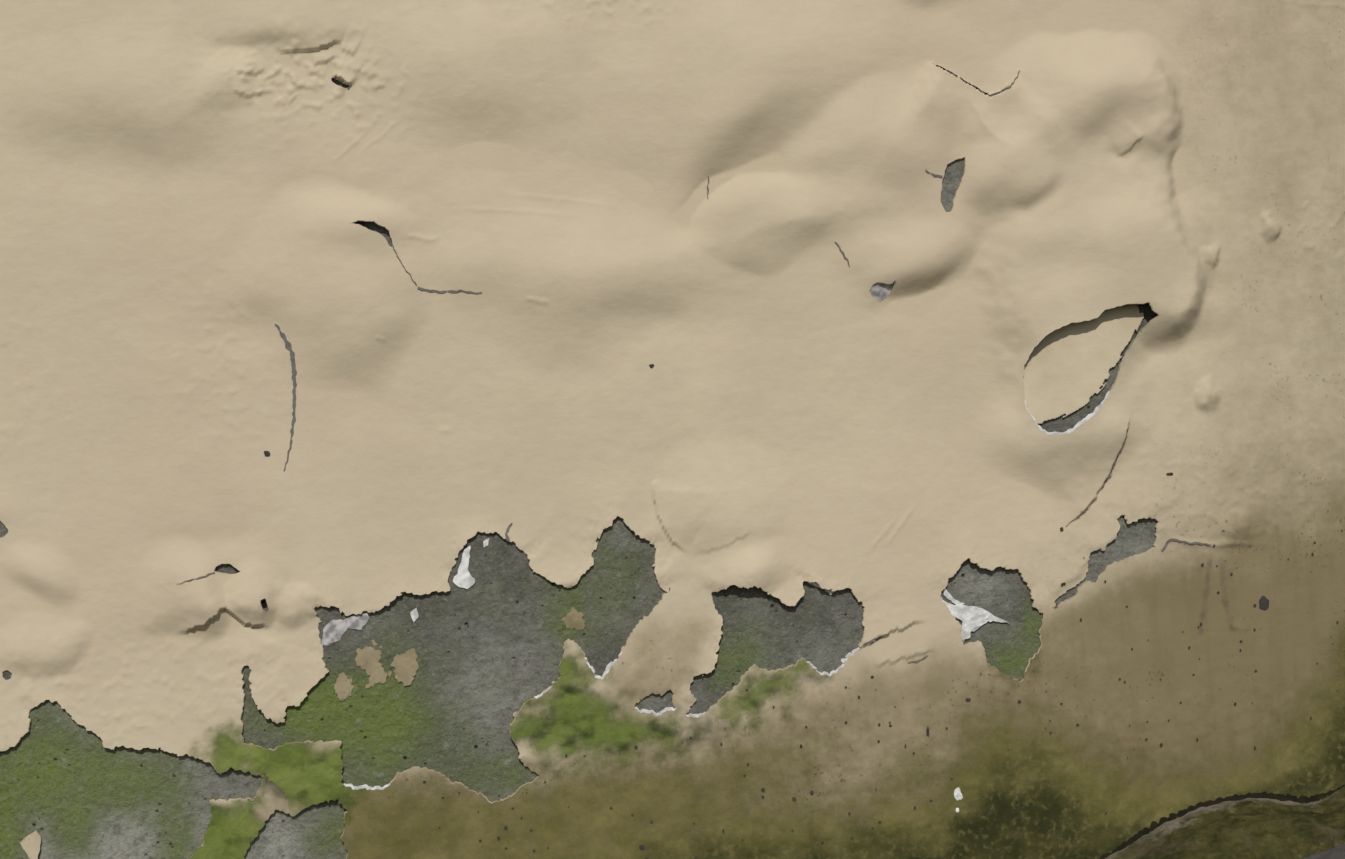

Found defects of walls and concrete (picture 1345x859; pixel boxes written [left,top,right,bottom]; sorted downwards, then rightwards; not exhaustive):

crack [936,65,1020,96]
peeling [941,158,965,212]
crack [393,248,482,294]
crack [275,324,297,471]
peeling [1038,302,1158,433]
crack [1068,423,1130,524]
peeling [241,516,670,802]
peeling [635,581,864,714]
peeling [941,515,1158,682]
peeling [0,700,262,859]
peeling [245,800,348,859]
crack [1100,785,1345,859]